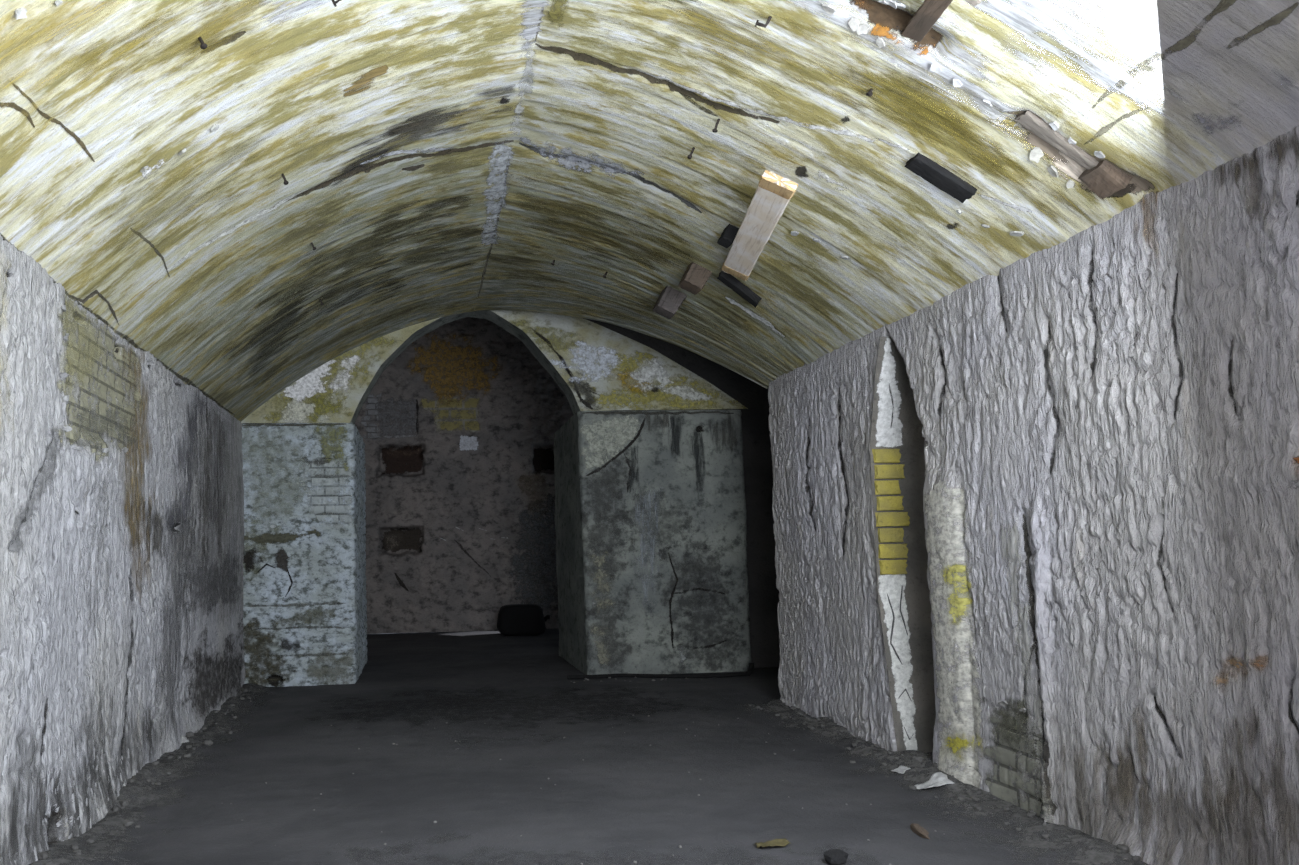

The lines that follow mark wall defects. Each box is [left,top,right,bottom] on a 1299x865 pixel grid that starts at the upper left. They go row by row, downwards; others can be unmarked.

crack [0,81,95,162]
crack [535,6,908,150]
spalling [822,0,962,87]
water stain [229,259,404,386]
crack [532,329,734,492]
water stain [144,390,354,727]
water stain [581,412,750,674]